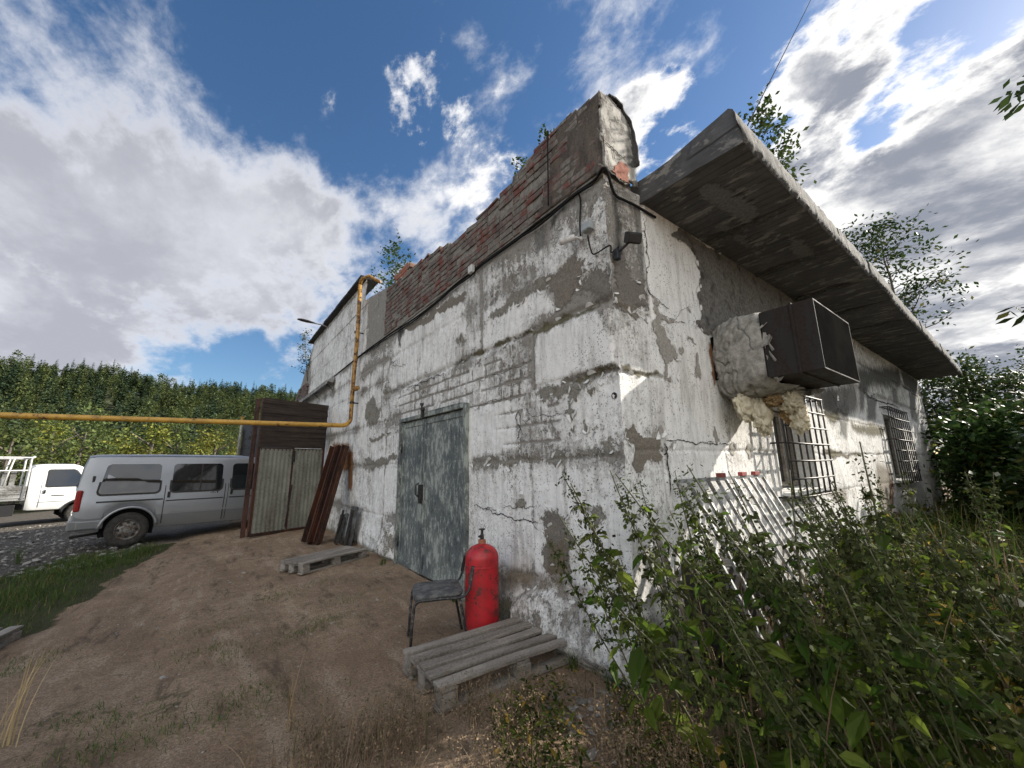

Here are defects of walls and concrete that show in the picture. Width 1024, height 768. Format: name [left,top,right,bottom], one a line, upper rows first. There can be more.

crack [644,219,694,323]
peeling [483,228,797,382]
peeling [365,396,399,443]
spalling [623,424,677,473]
crack [655,438,739,496]
crack [476,504,538,530]
flaking render [540,507,576,576]